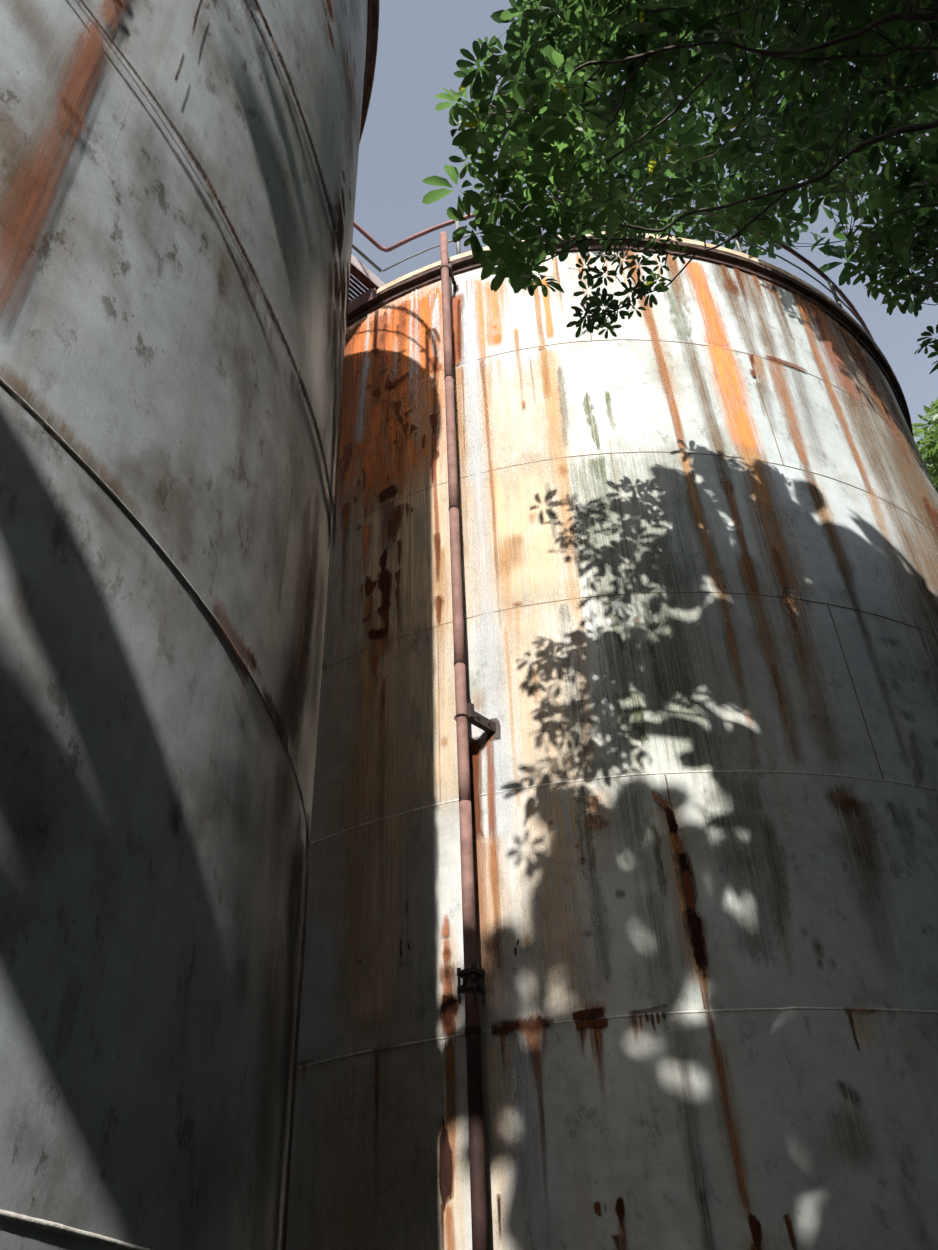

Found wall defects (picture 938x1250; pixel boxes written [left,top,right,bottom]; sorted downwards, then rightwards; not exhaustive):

corrosion [0,0,518,747]
corrosion [619,250,741,682]
corrosion [667,254,938,740]
corrosion [407,650,453,797]
corrosion [282,815,313,1250]
corrosion [439,915,458,1250]
corrosion [491,1014,553,1121]
corrosion [572,1003,607,1065]
corrosion [594,1197,625,1250]
corrosion [707,1010,761,1250]
corrosion [784,1215,796,1250]